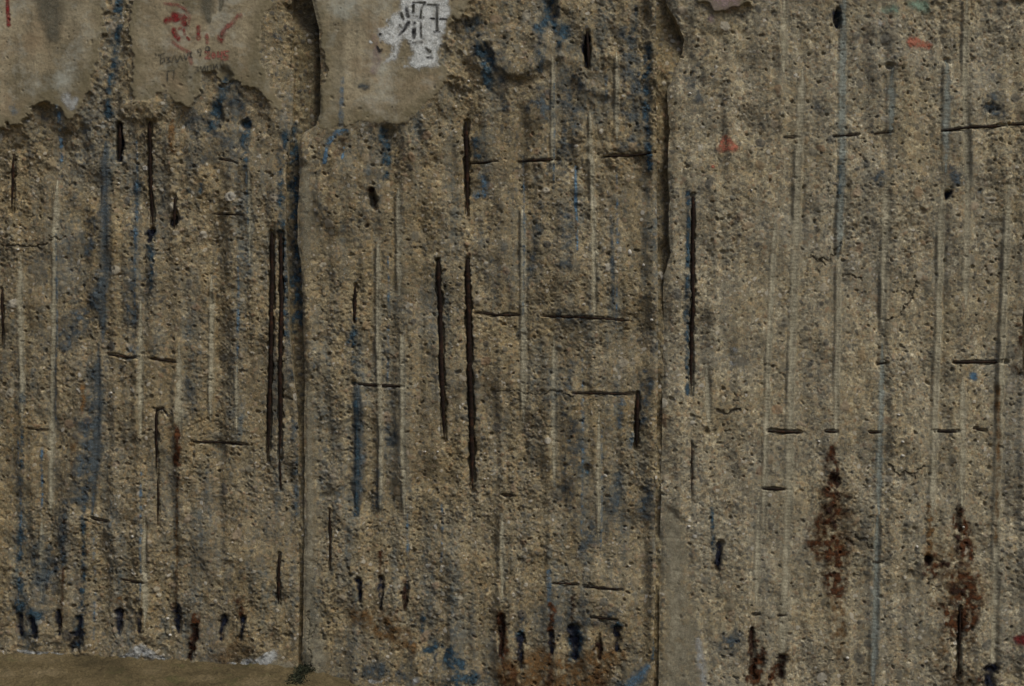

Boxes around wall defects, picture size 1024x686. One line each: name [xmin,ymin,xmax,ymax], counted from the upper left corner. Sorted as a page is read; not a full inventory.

spalling [0,0,658,686]
rust [745,626,781,686]
rust [806,445,851,659]
rust [924,504,984,655]